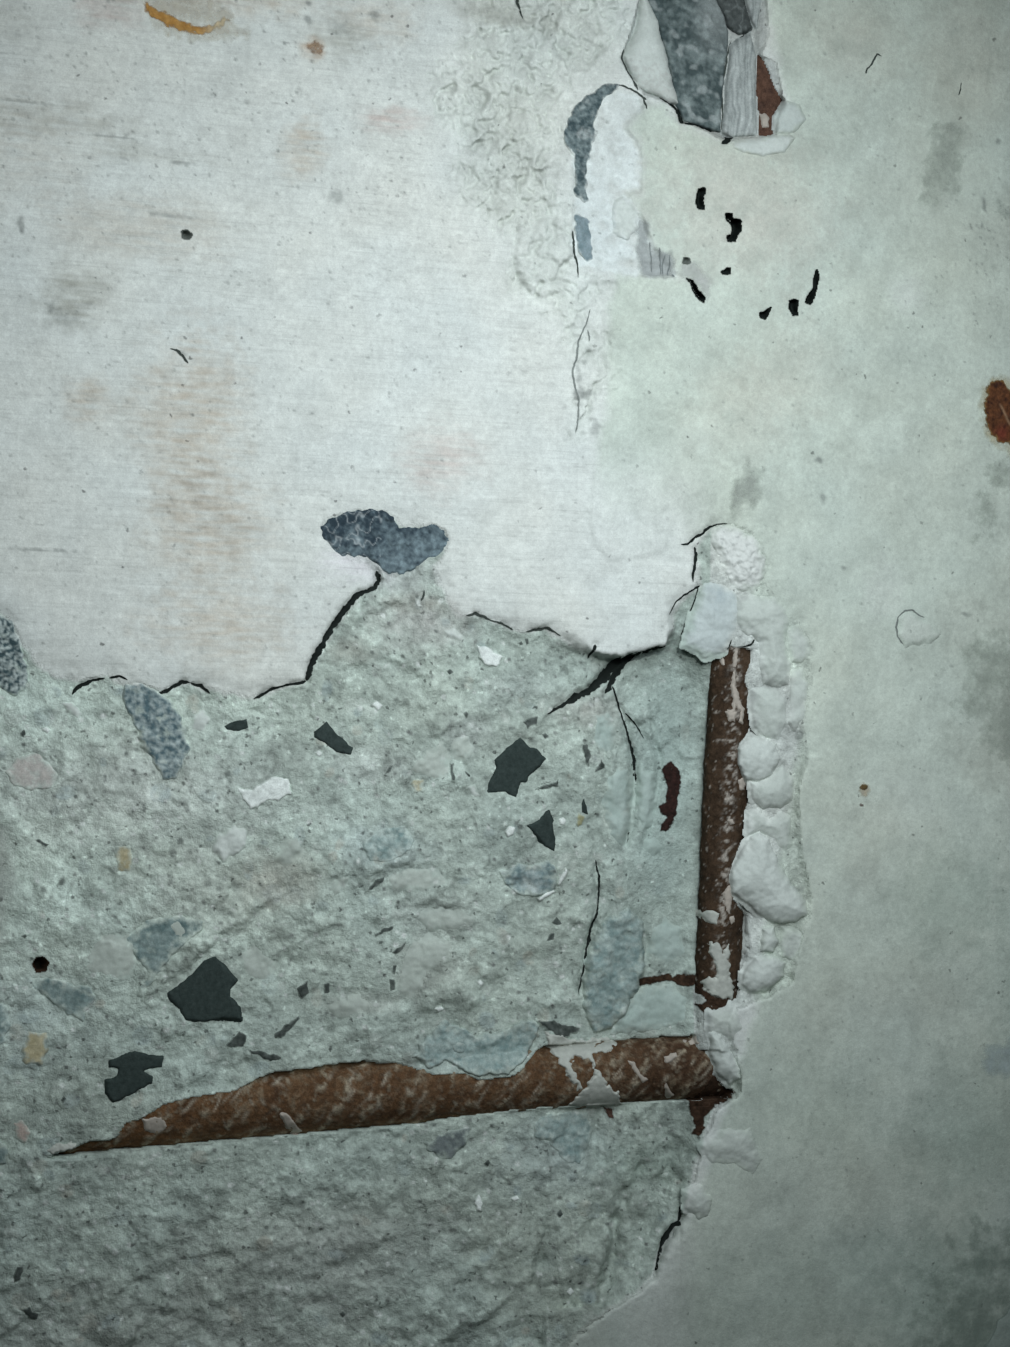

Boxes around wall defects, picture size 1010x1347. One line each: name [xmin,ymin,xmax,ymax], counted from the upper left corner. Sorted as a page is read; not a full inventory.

spalling [563,0,806,303]
corrosion [984,380,1010,444]
crack [254,571,381,699]
crack [466,612,560,636]
crack [548,523,727,785]
corrosion [659,761,681,831]
spalling [0,508,814,1347]
crack [578,860,600,993]
corrosion [639,973,728,1012]
corrosion [686,1075,735,1136]